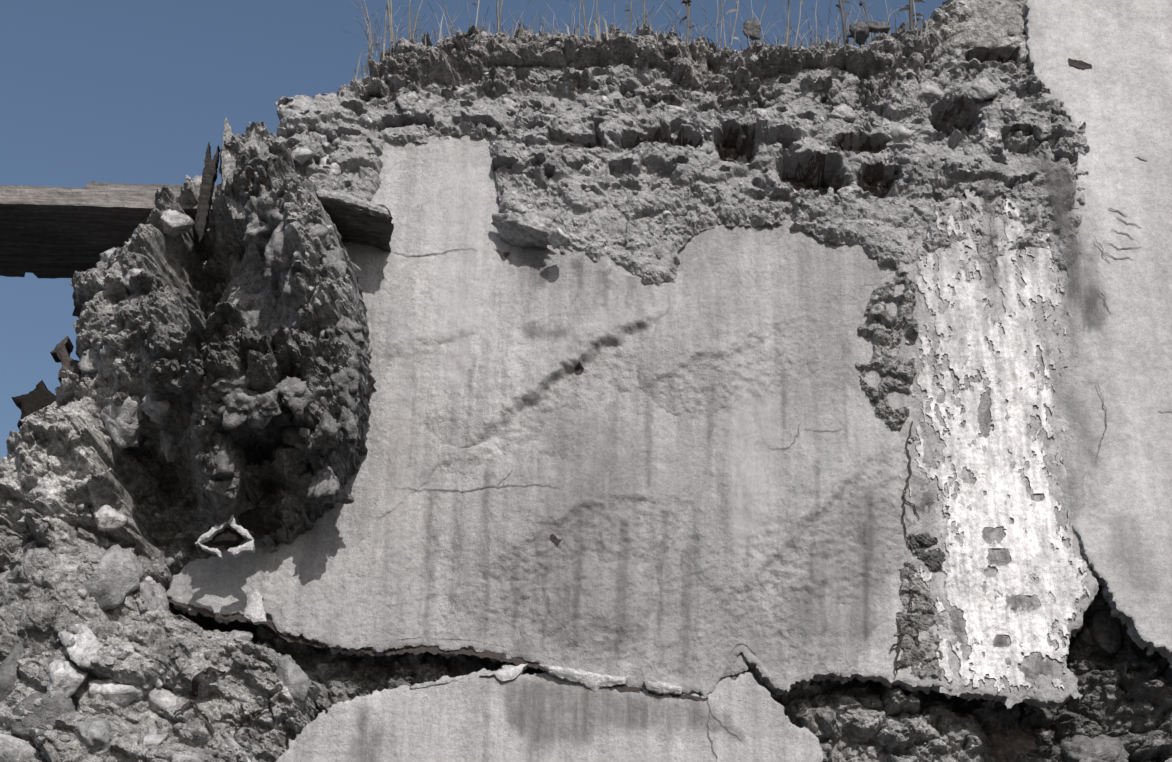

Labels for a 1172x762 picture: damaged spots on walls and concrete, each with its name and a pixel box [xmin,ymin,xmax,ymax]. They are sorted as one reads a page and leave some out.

hole [966,45,1021,67]
flaking render [1068,58,1092,69]
hole [556,123,755,165]
hole [778,132,894,199]
crack [395,472,556,492]
peeling [722,187,1172,762]
crack [168,589,748,761]